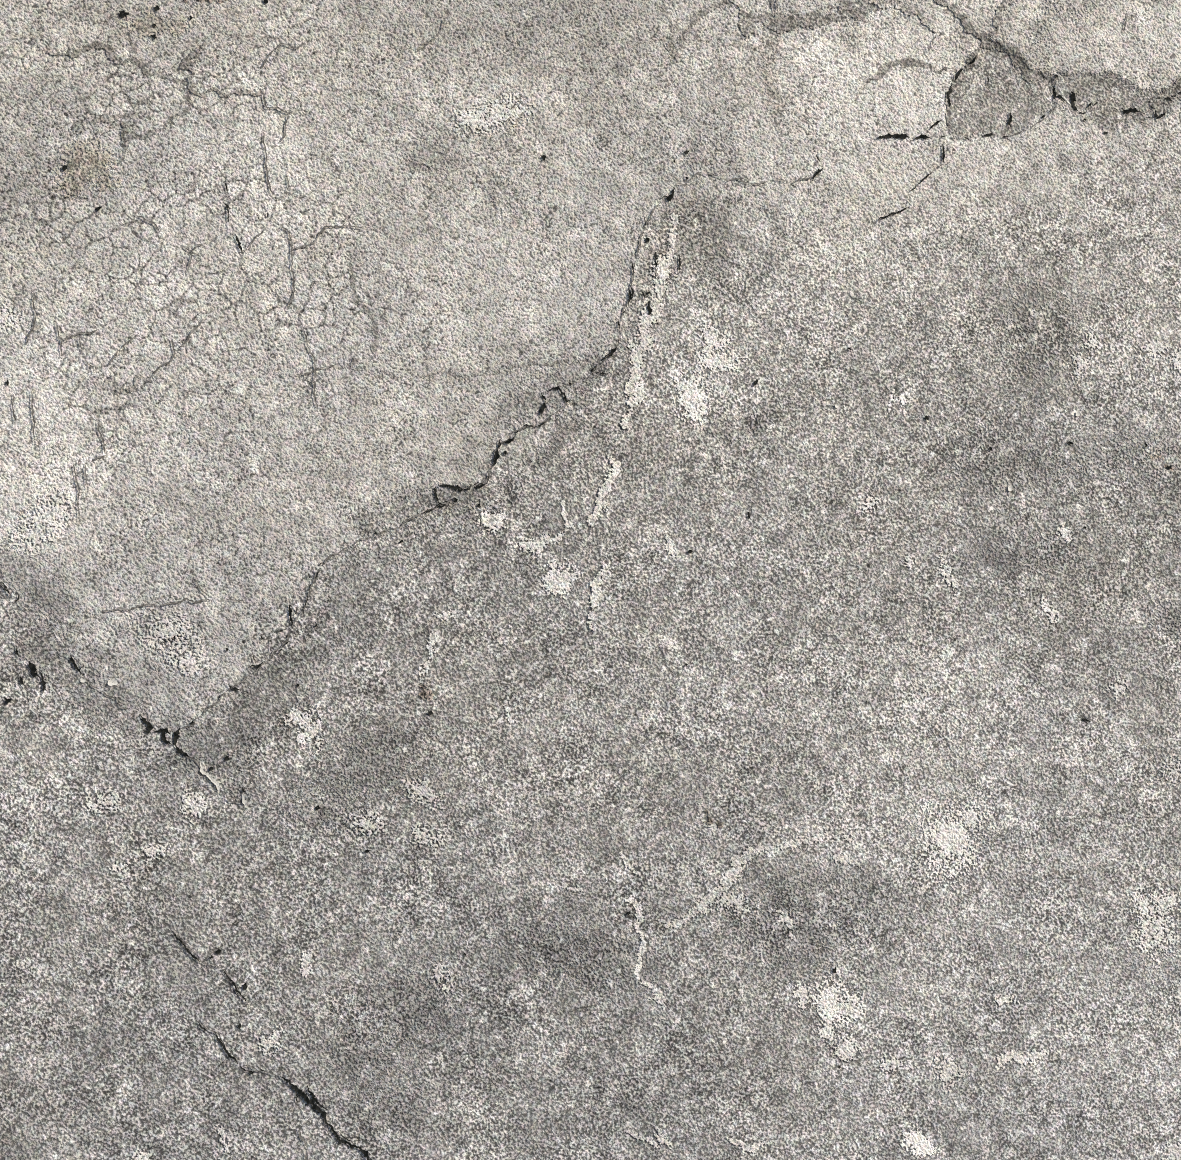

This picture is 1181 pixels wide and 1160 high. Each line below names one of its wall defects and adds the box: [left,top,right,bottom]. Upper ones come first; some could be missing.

crack [354,0,365,37]
crack [877,56,1181,221]
crack [11,391,35,438]
crack [26,16,823,806]
crack [0,582,28,612]
crack [4,646,46,703]
crack [172,927,369,1160]